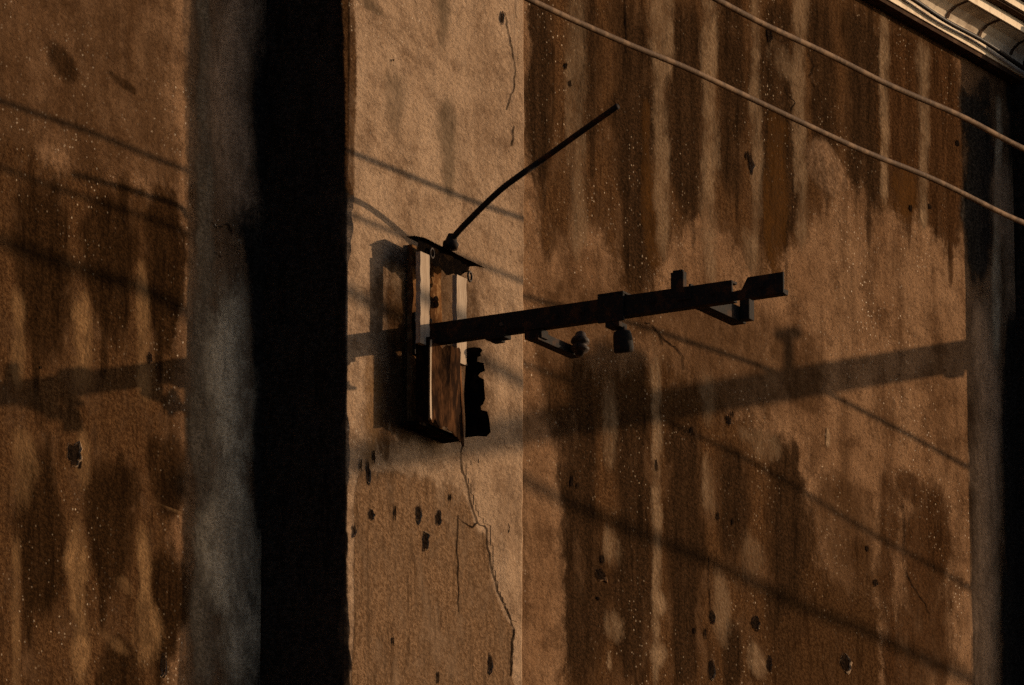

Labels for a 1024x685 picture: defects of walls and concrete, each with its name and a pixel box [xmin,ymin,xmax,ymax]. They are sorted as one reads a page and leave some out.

crack [505,13,516,146]
spalling [67,441,83,469]
leakage [0,0,357,685]
peeling [352,451,514,685]
crack [456,447,515,676]
leakage [524,0,1024,685]